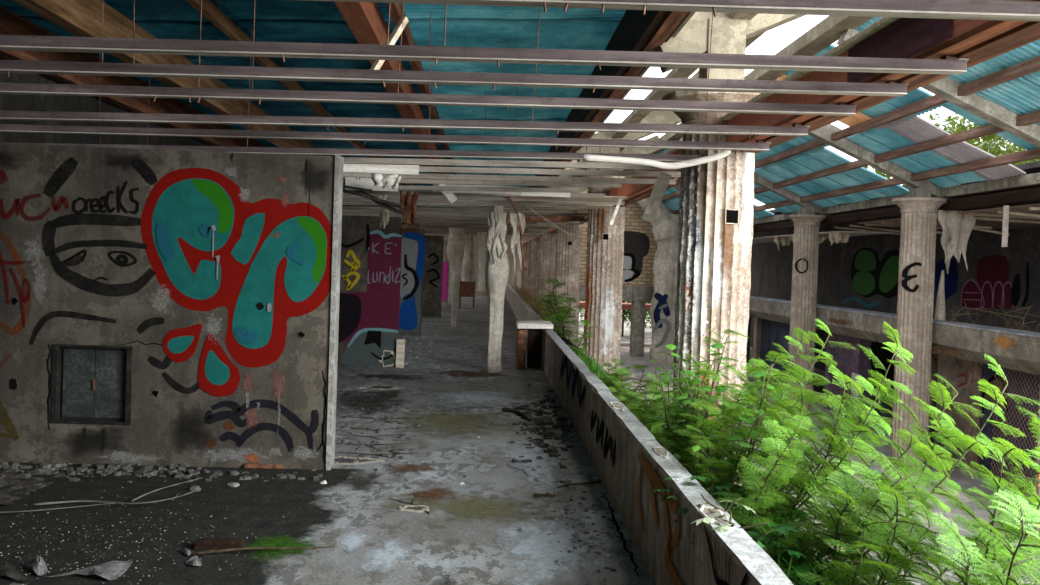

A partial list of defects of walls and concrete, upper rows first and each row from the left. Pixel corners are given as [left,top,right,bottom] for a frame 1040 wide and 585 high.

damp [338,374,419,414]
damp [408,410,499,435]
damp [412,497,538,520]
crack [604,494,640,577]